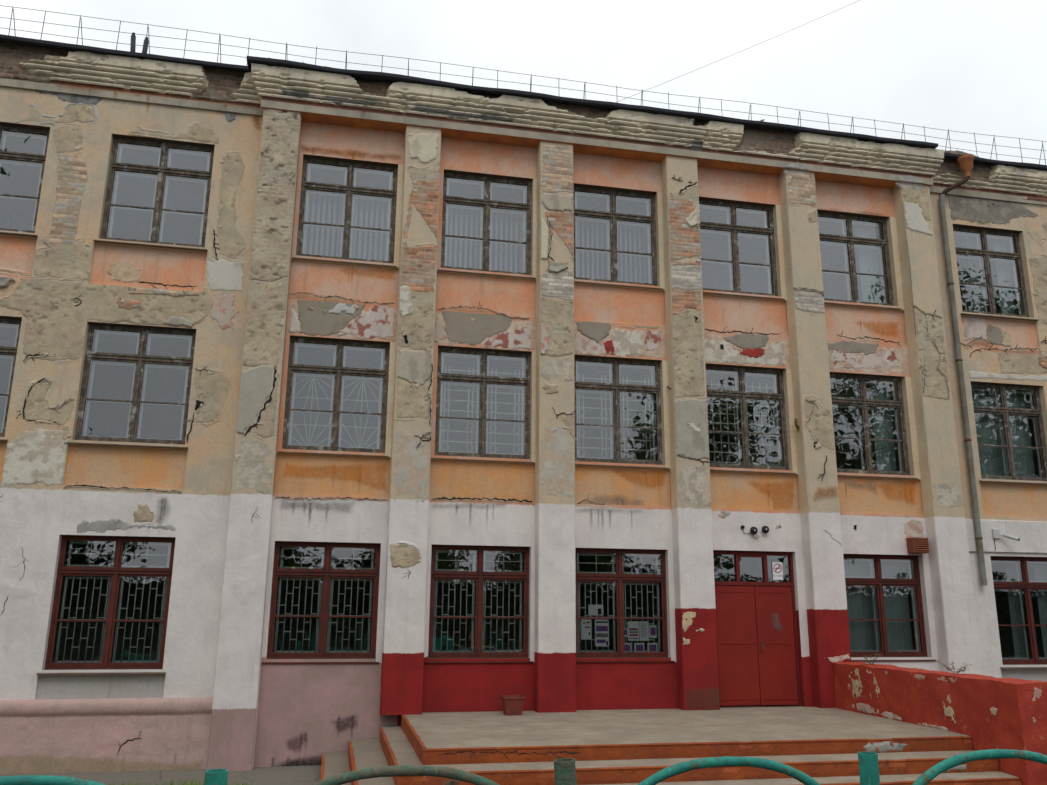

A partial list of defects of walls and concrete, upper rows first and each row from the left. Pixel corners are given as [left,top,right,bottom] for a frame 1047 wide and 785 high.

flaking render [190,67,247,122]
peeling [277,76,395,106]
flaking render [459,90,501,98]
flaking render [543,101,618,119]
spalling [0,41,215,364]
spalling [127,108,790,497]
spalling [827,311,950,400]
peeling [1,378,74,487]
spalling [389,540,422,568]
peeling [682,611,704,645]
peeling [824,654,902,720]
peeling [914,674,957,730]